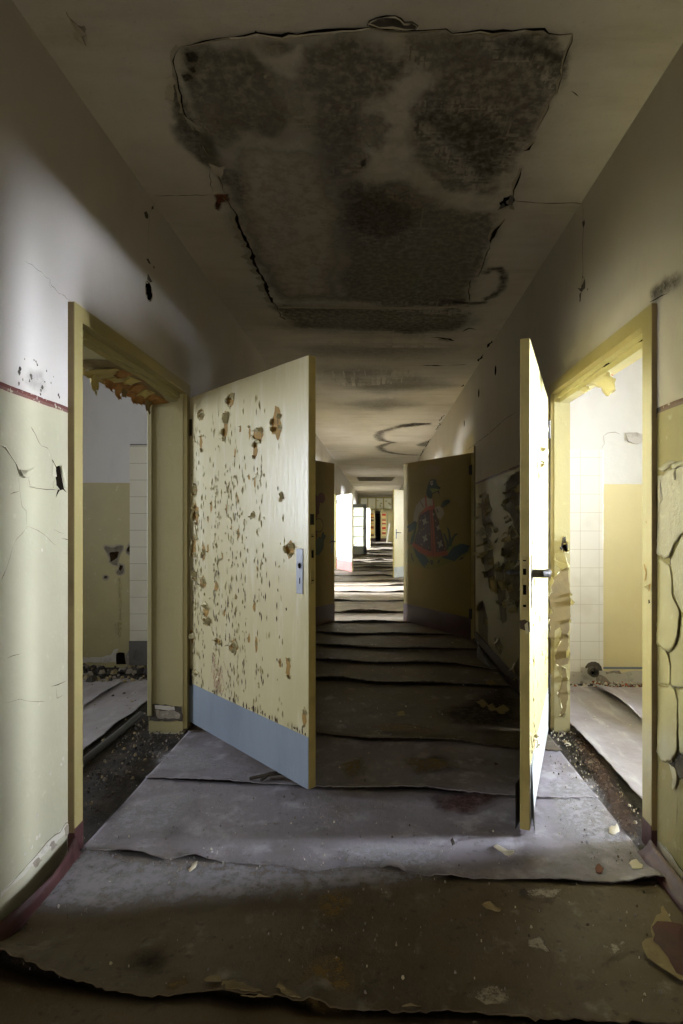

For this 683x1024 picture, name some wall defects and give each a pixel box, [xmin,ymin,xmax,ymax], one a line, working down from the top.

water stain [182,43,507,332]
crack [144,27,588,319]
water stain [406,37,563,188]
crack [1,444,69,578]
flaking render [83,542,130,664]
peeling [83,360,169,414]
water stain [374,423,430,455]
peeling [471,397,642,754]
peeling [576,372,616,396]
peeling [644,466,683,790]